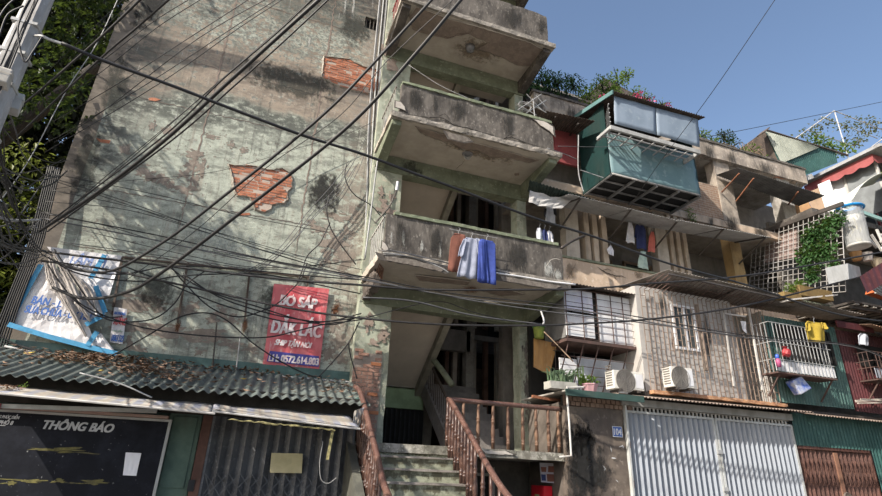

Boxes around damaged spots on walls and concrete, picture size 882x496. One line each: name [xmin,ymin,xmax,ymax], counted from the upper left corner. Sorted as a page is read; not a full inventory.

leakage [245,59,336,101]
spalling [320,44,398,95]
peeling [206,133,249,154]
spalling [227,163,294,216]
leakage [309,174,339,214]
flaking render [321,298,390,437]
leakage [563,415,615,496]